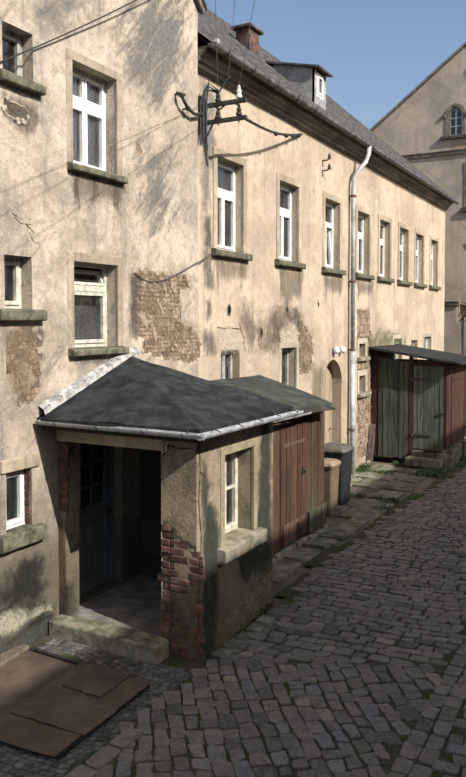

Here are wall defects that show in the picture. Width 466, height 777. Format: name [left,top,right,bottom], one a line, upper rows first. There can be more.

water stain [119,1,192,102]
spalling [1,96,30,124]
crack [12,213,40,244]
water stain [138,145,177,234]
peeling [130,265,202,364]
spalling [6,325,45,406]
flaking render [357,309,372,461]
water stain [0,557,77,654]
flaking render [157,523,205,665]
water stain [202,470,218,653]